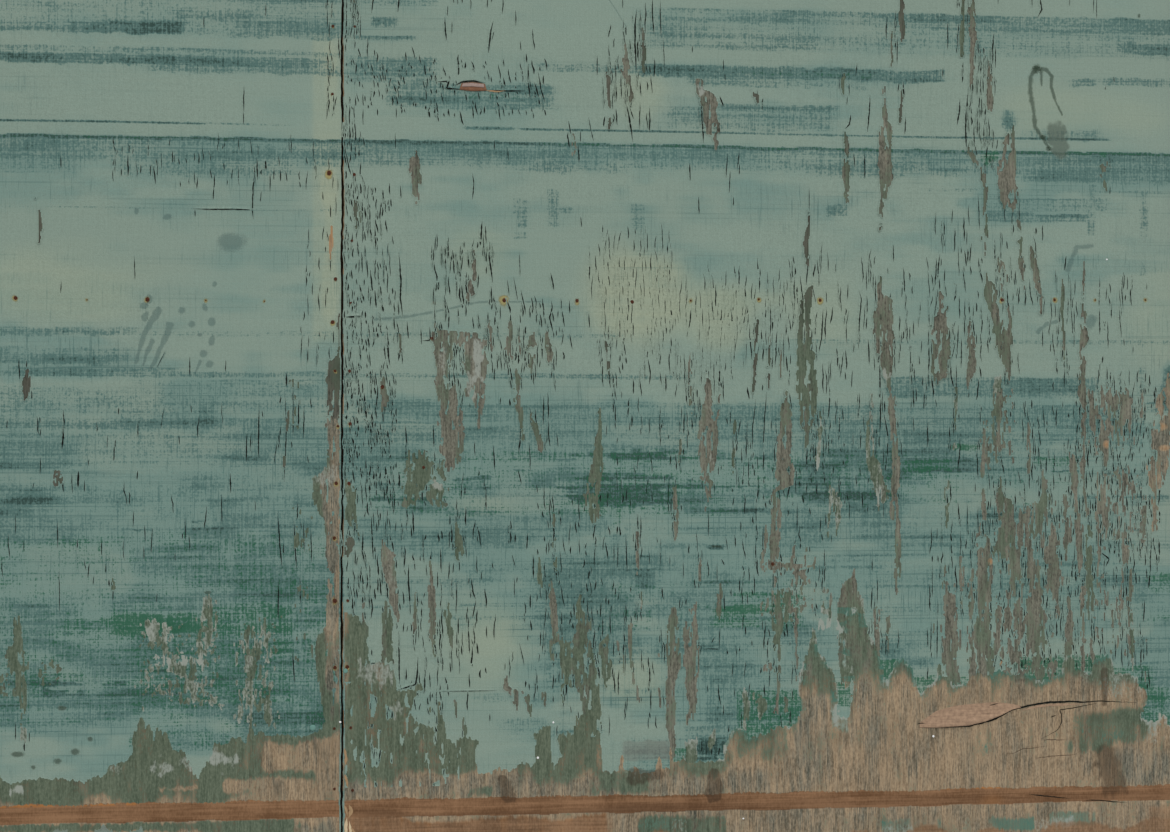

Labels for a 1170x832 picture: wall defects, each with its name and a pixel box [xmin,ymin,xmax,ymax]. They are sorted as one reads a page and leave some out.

peeling [885,0,907,68]
peeling [841,131,851,208]
peeling [876,82,907,232]
peeling [1098,272,1133,348]
peeling [746,312,763,400]
peeling [761,210,851,541]
peeling [528,392,551,454]
peeling [668,351,725,513]
peeling [851,249,923,596]
peeling [0,612,64,751]
peeling [502,651,548,718]
peeling [641,657,658,729]